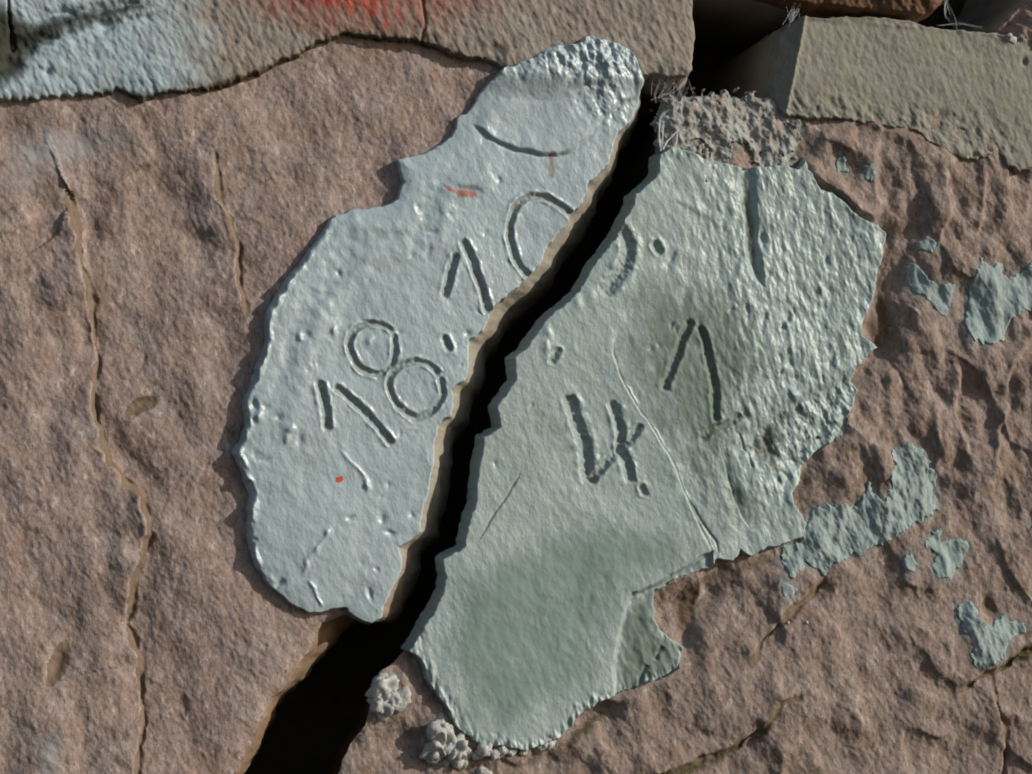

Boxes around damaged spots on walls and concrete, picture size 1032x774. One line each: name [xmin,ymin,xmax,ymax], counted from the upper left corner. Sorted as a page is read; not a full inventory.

crack [213,150,250,317]
spalling [861,245,910,362]
crack [63,185,157,774]
crack [237,90,657,774]
crack [613,341,719,561]
spalling [981,597,996,617]
crack [958,644,1032,774]